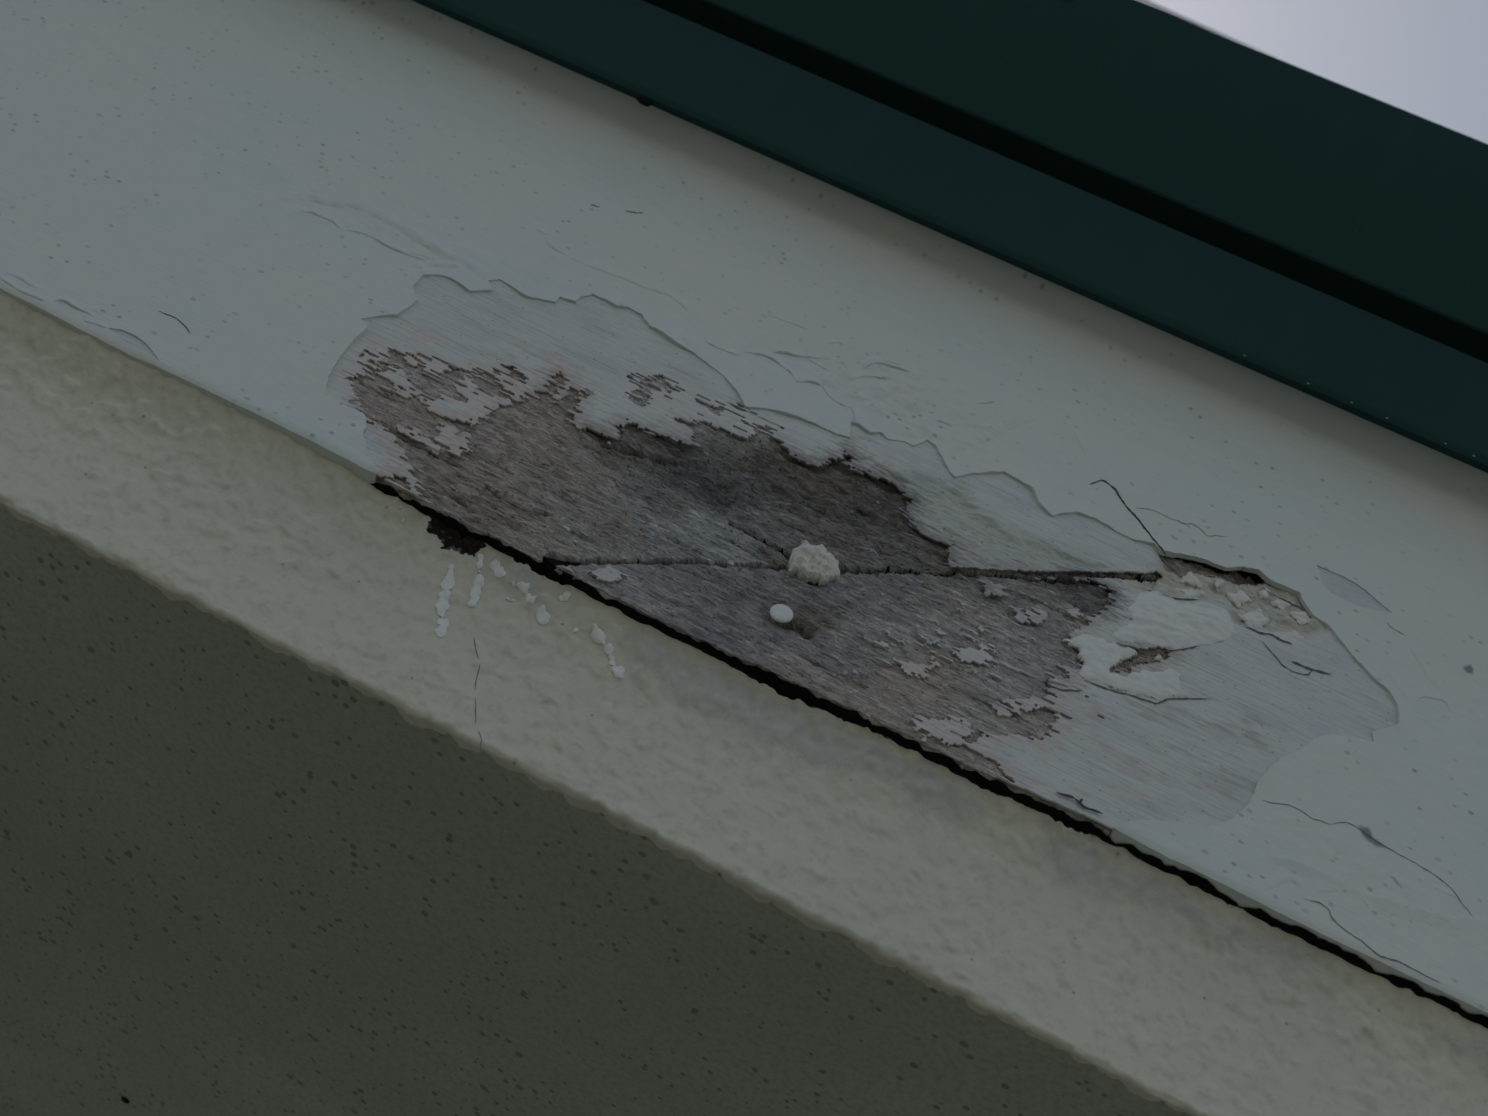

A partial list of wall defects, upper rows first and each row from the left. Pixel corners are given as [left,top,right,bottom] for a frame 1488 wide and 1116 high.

peeling [326,276,1397,836]